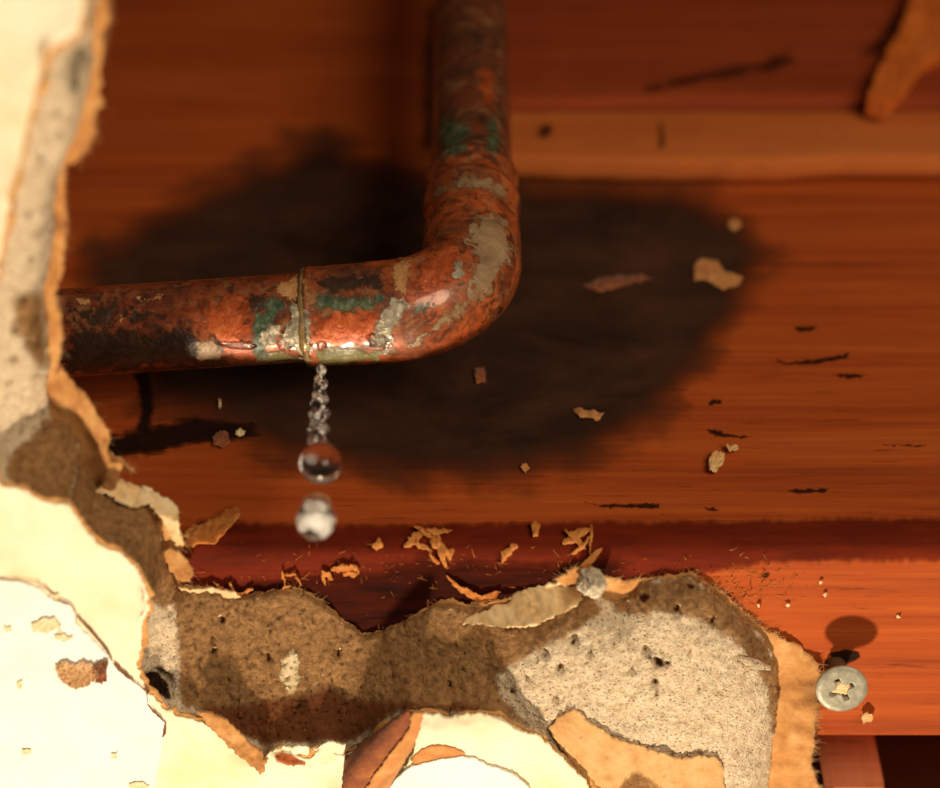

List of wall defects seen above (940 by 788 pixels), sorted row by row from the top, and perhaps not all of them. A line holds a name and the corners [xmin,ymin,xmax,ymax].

damp [108,372,256,457]
spalling [55,660,108,690]
crack [0,579,167,737]
peeling [738,654,771,671]
peeling [390,711,589,788]